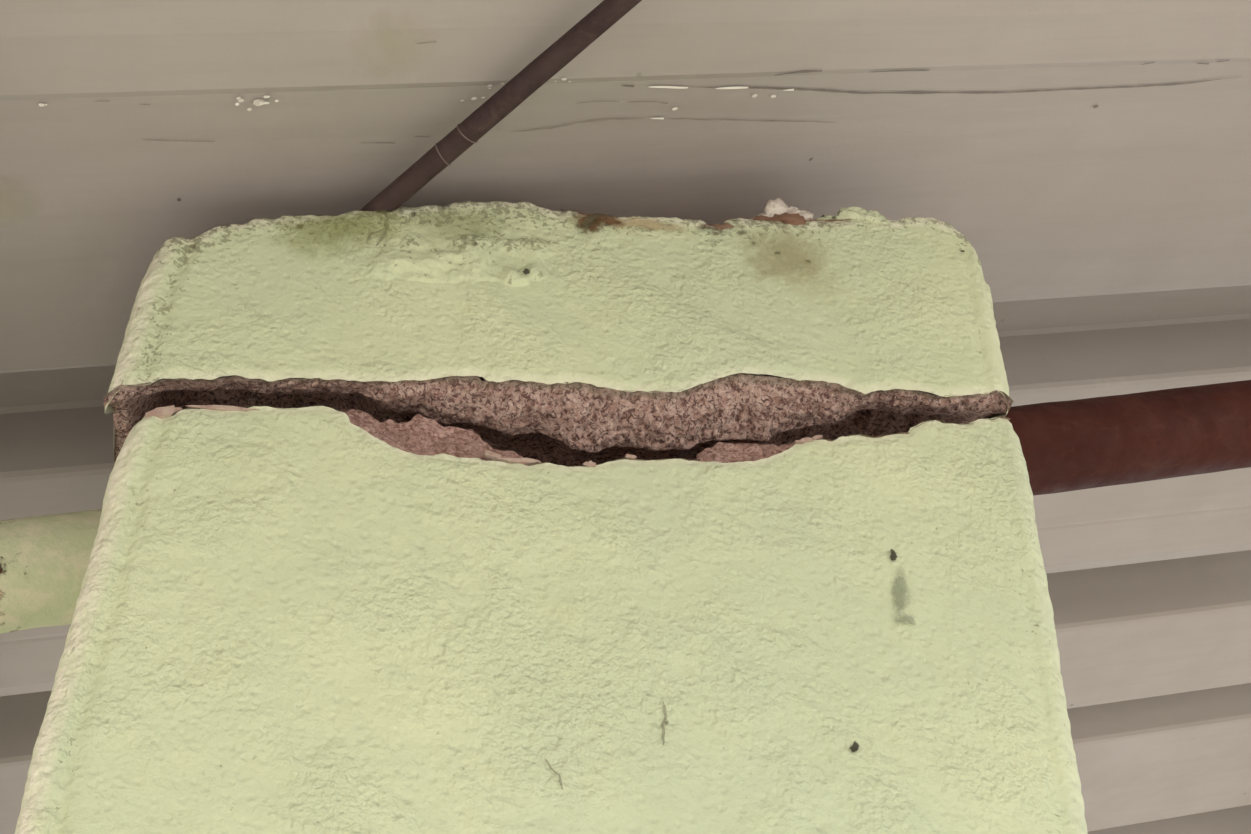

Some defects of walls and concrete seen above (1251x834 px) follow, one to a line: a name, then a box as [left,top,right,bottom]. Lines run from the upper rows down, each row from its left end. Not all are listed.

crack [103,374,1014,467]